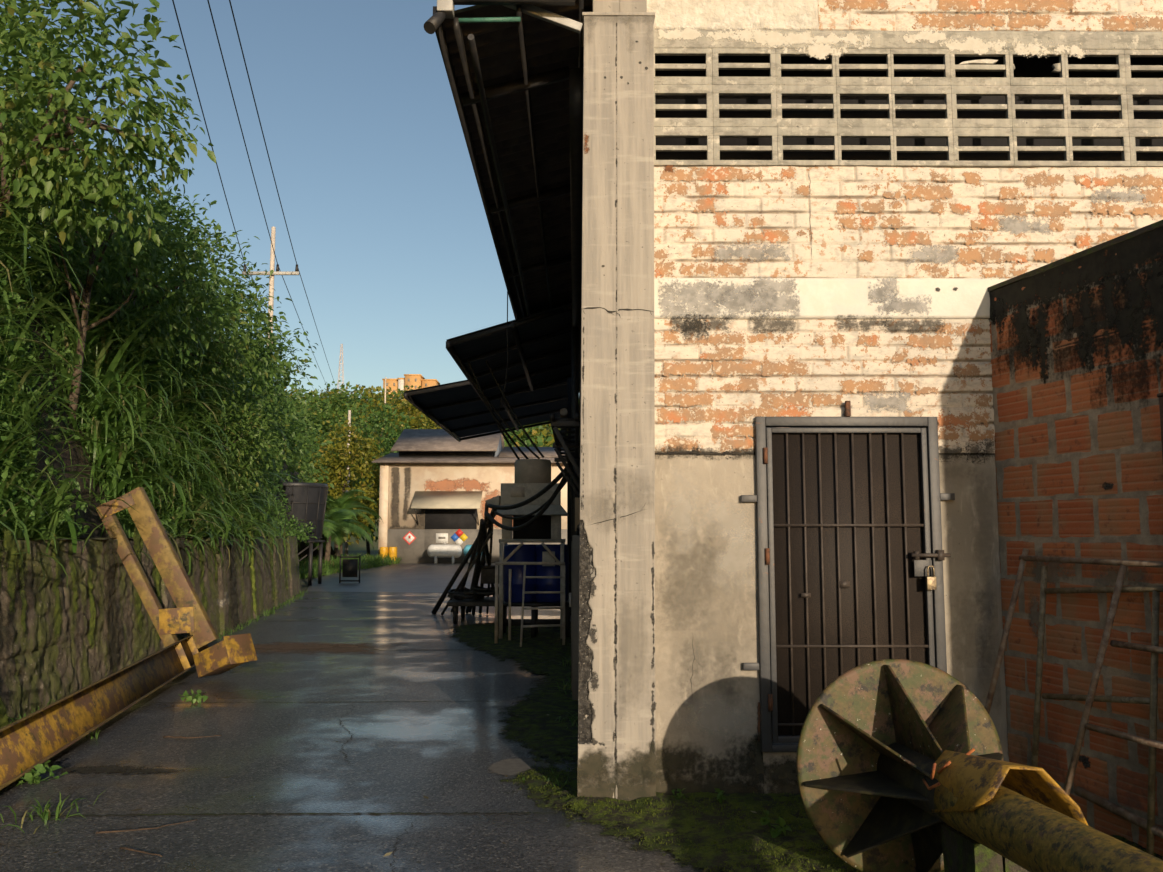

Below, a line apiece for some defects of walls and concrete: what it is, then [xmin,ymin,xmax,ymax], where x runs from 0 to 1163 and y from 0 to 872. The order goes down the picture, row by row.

peeling [656,27,873,59]
peeling [903,0,1087,58]
peeling [659,166,816,244]
peeling [834,171,1163,292]
leakage [999,216,1053,234]
leakage [989,226,1163,403]
peeling [657,329,939,453]
spalling [578,318,618,763]
leakage [68,534,121,671]
leakage [151,561,175,606]
leakage [254,642,402,655]
leakage [577,735,800,809]